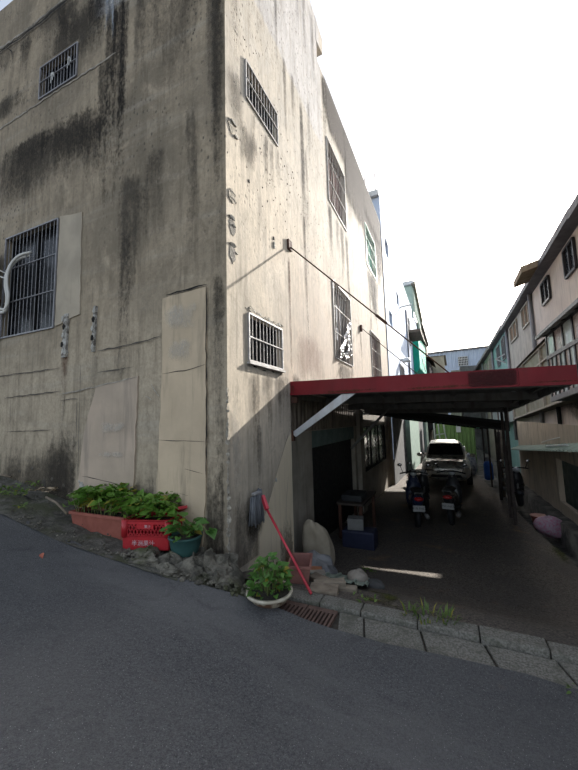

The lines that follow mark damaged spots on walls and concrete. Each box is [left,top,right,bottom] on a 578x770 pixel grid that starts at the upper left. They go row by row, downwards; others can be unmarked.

damp [0,0,142,189]
damp [208,0,223,122]
damp [244,131,273,165]
damp [7,445,74,502]